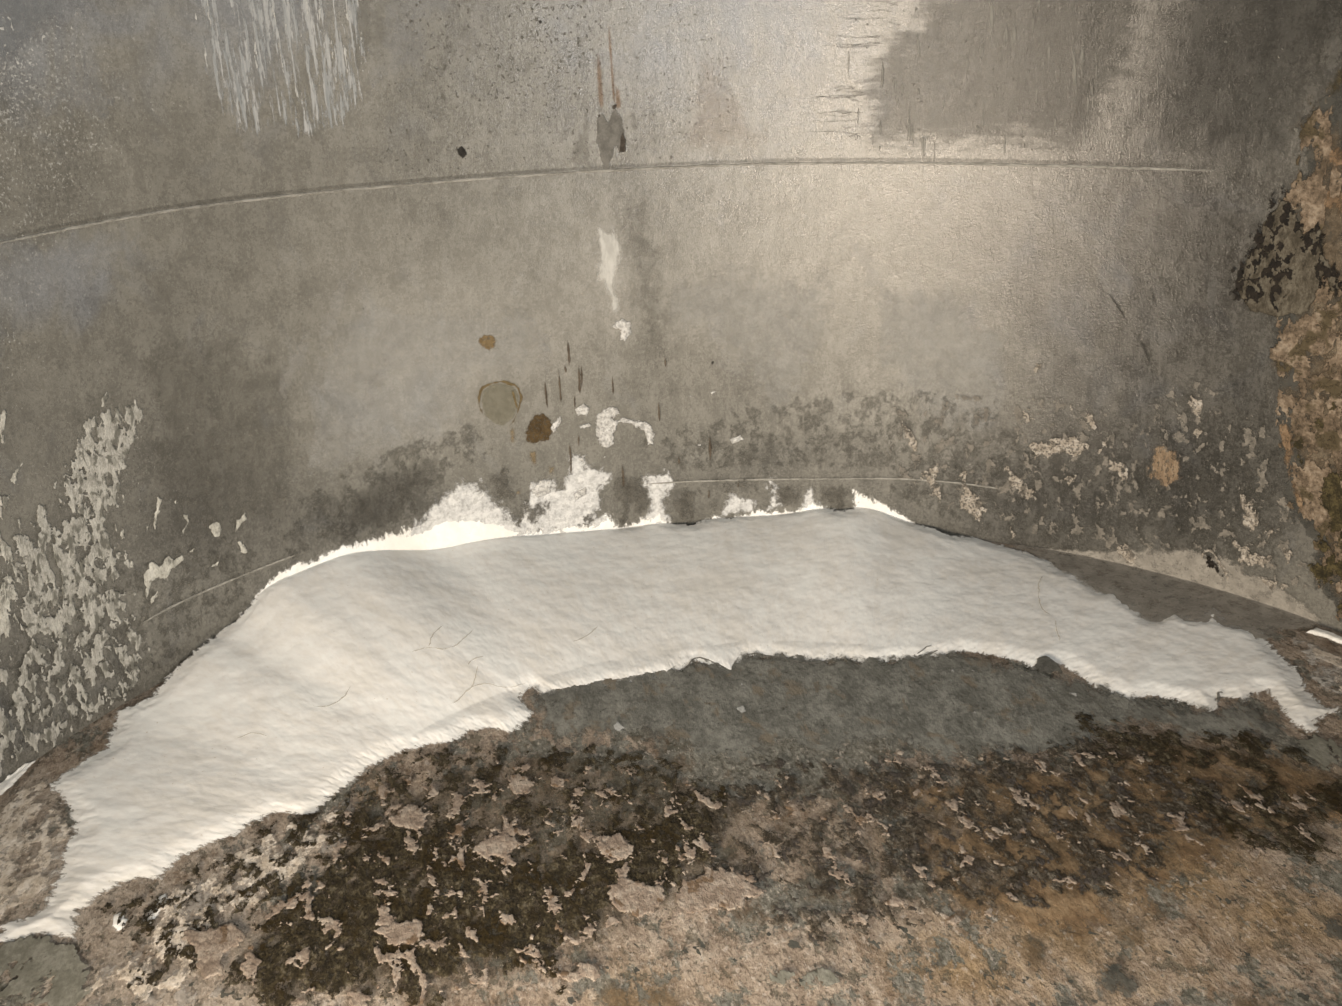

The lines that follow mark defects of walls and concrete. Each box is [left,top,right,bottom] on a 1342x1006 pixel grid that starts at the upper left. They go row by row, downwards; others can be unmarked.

leakage [596,109,625,169]
rust [479,335,496,350]
rust [511,344,583,463]
leakage [491,469,550,523]
leakage [614,478,651,524]
leakage [723,479,800,505]
peeling [209,512,248,553]
peeling [0,392,194,777]
leakage [1014,545,1319,639]